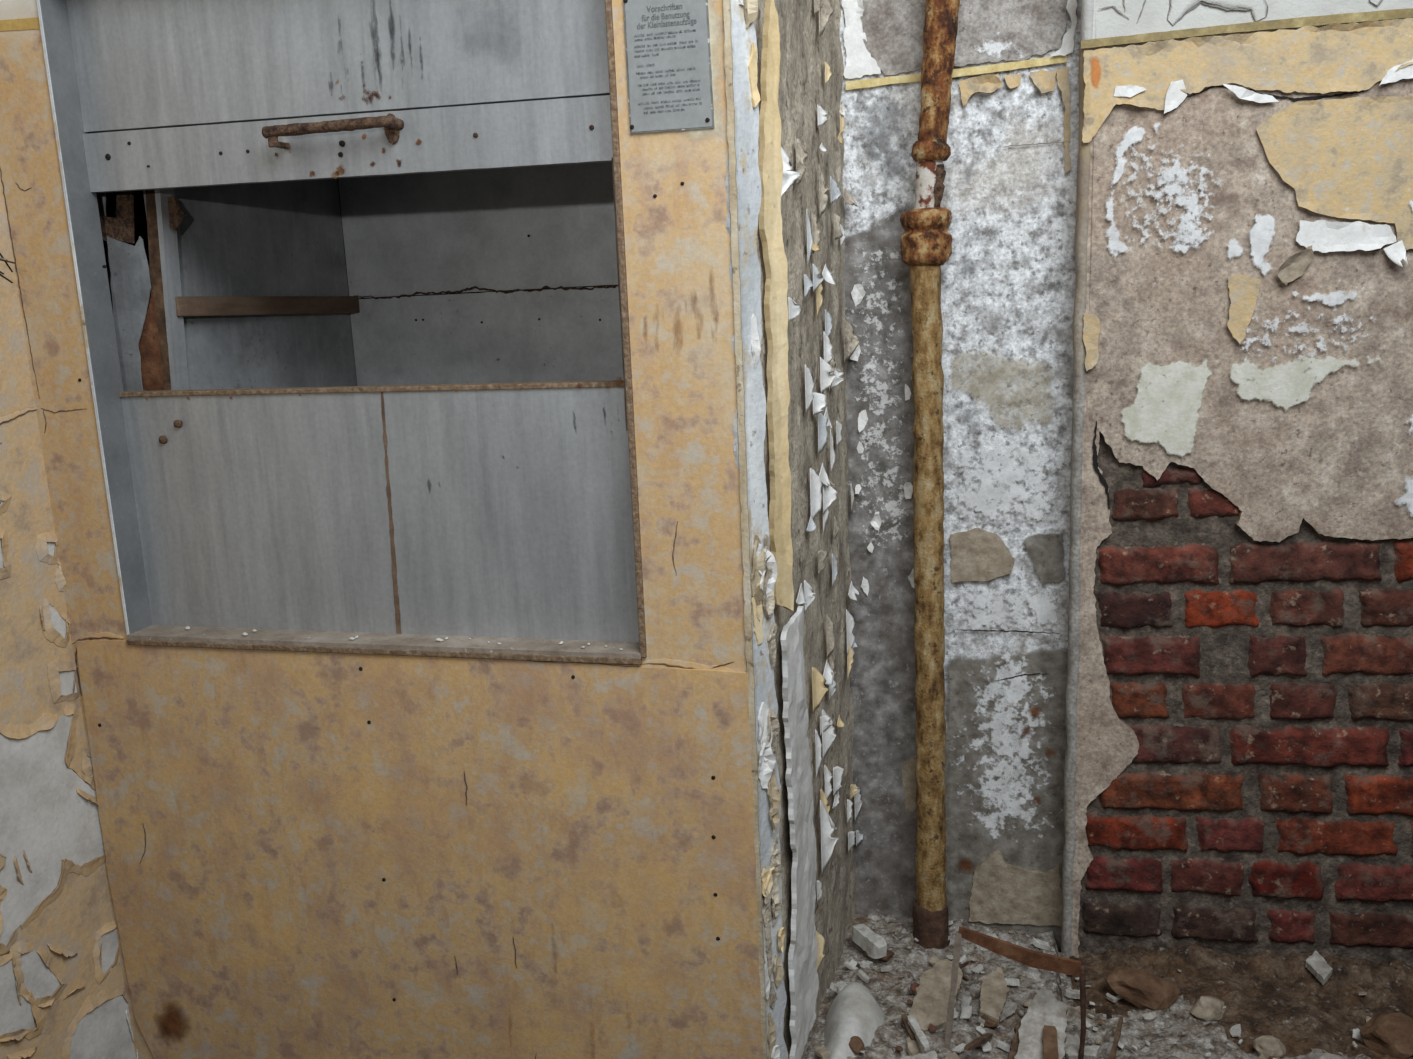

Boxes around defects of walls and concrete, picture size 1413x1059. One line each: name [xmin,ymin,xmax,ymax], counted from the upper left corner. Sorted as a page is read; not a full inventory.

leakage [361,8,422,82]
flaking render [814,0,926,84]
crack [1101,0,1268,25]
peeling [954,0,1413,285]
rust [933,164,946,207]
crack [0,168,82,444]
peeling [738,0,869,1059]
peeling [867,512,881,553]
flaking render [949,527,1014,583]
flaking render [969,431,1413,967]
peeling [0,532,138,1059]
rust [158,1006,186,1038]